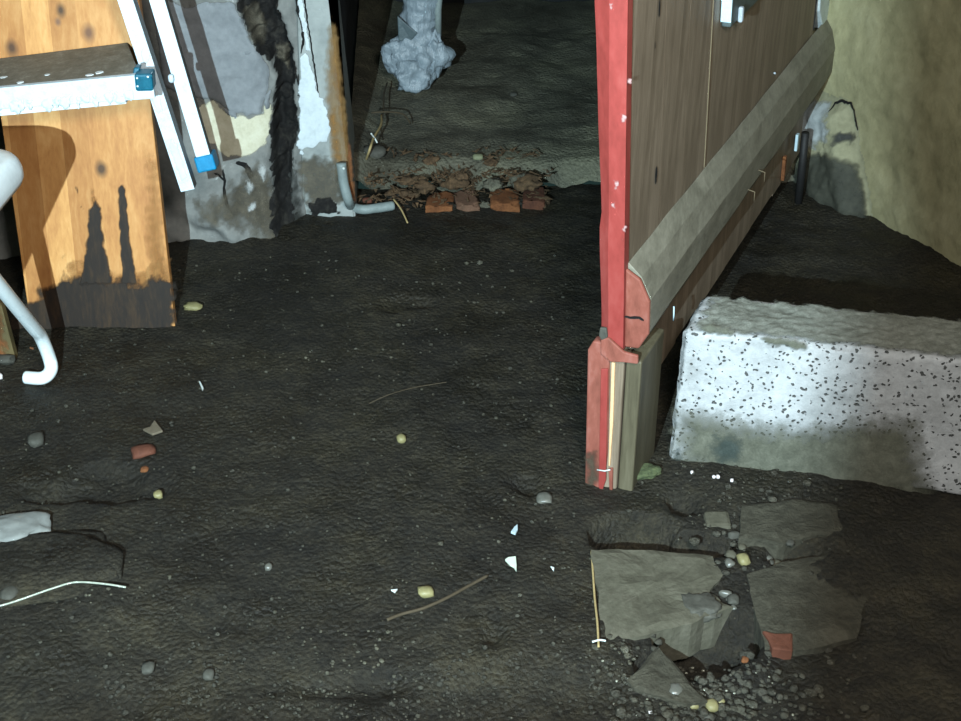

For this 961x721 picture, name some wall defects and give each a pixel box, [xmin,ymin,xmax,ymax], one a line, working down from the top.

peeling [153,15,176,92]
peeling [168,0,331,237]
spalling [308,197,340,216]